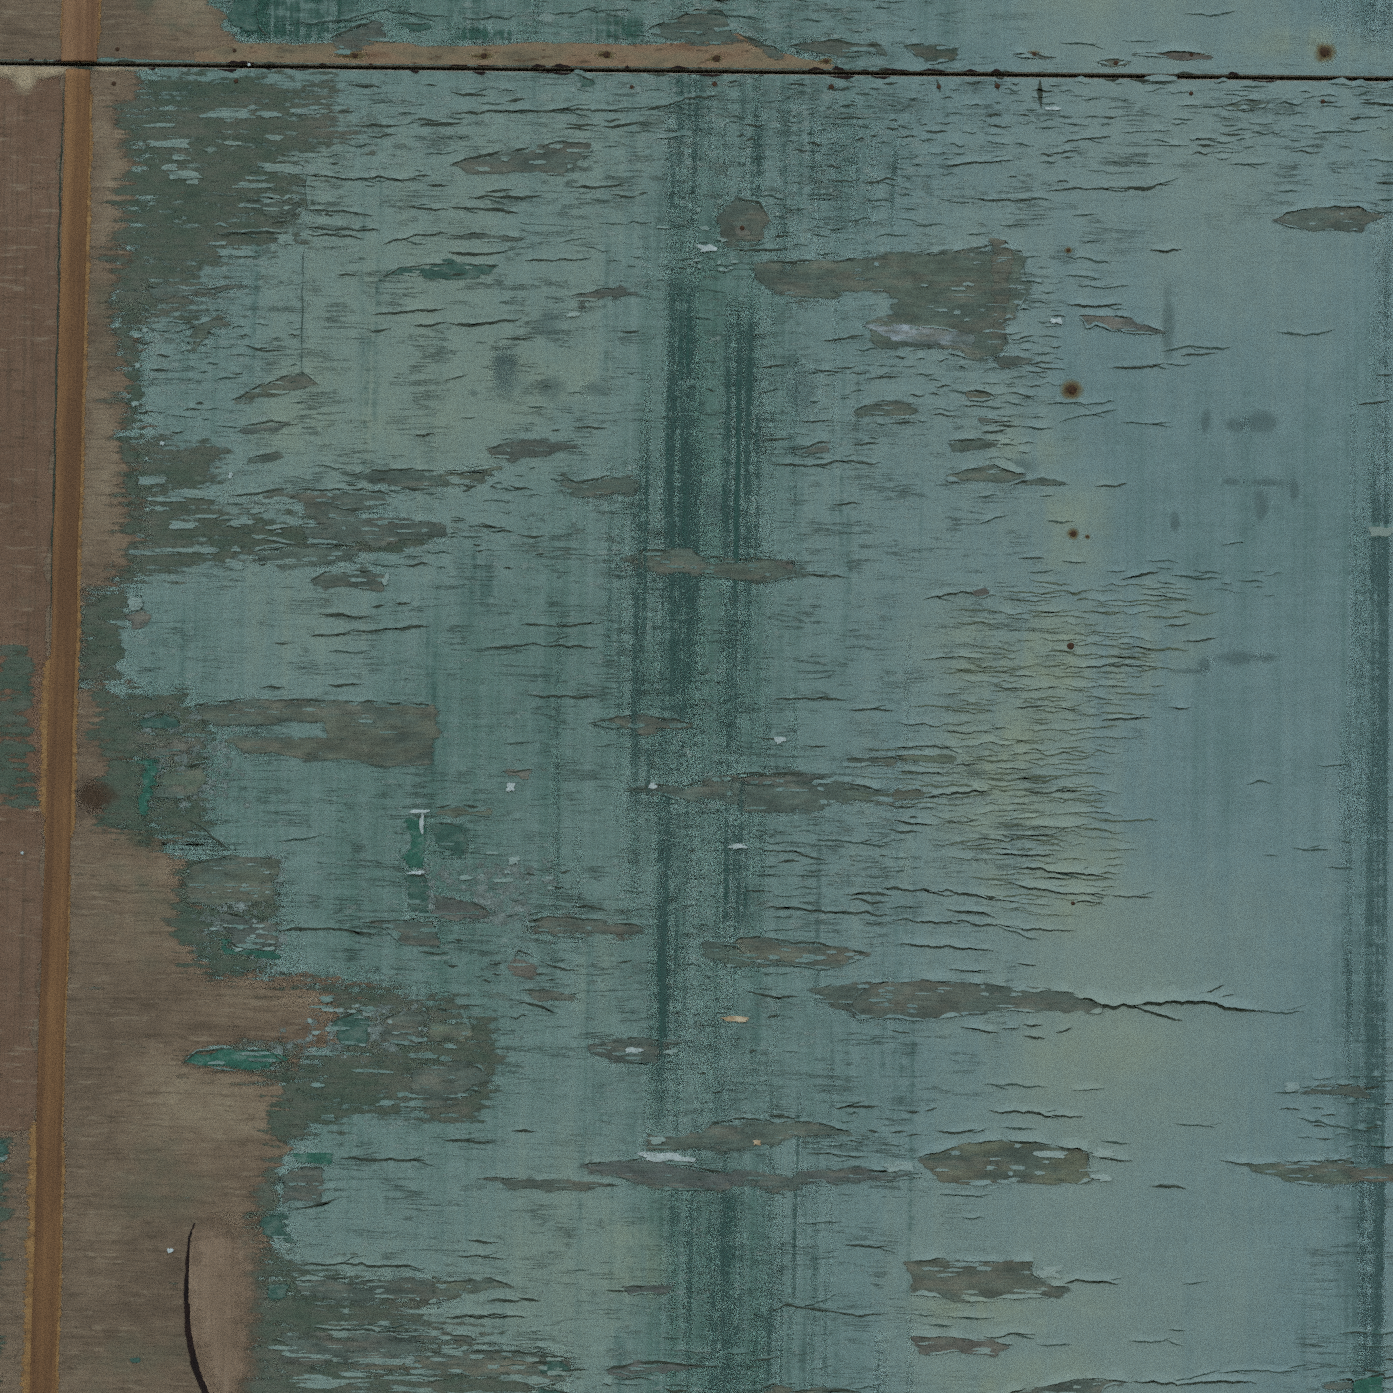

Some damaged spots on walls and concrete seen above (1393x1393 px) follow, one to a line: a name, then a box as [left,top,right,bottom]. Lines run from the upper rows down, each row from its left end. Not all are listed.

peeling [1273,195,1384,232]
peeling [683,193,1034,367]
peeling [854,397,919,424]
peeling [946,383,1070,486]
peeling [0,0,648,1393]
peeling [702,932,1104,1021]
water stain [1370,508,1389,1366]
peeling [588,1031,684,1064]
peeling [477,1112,1115,1193]
crack [184,1223,209,1393]
peeling [904,1245,1070,1302]
peeling [974,1366,1132,1393]